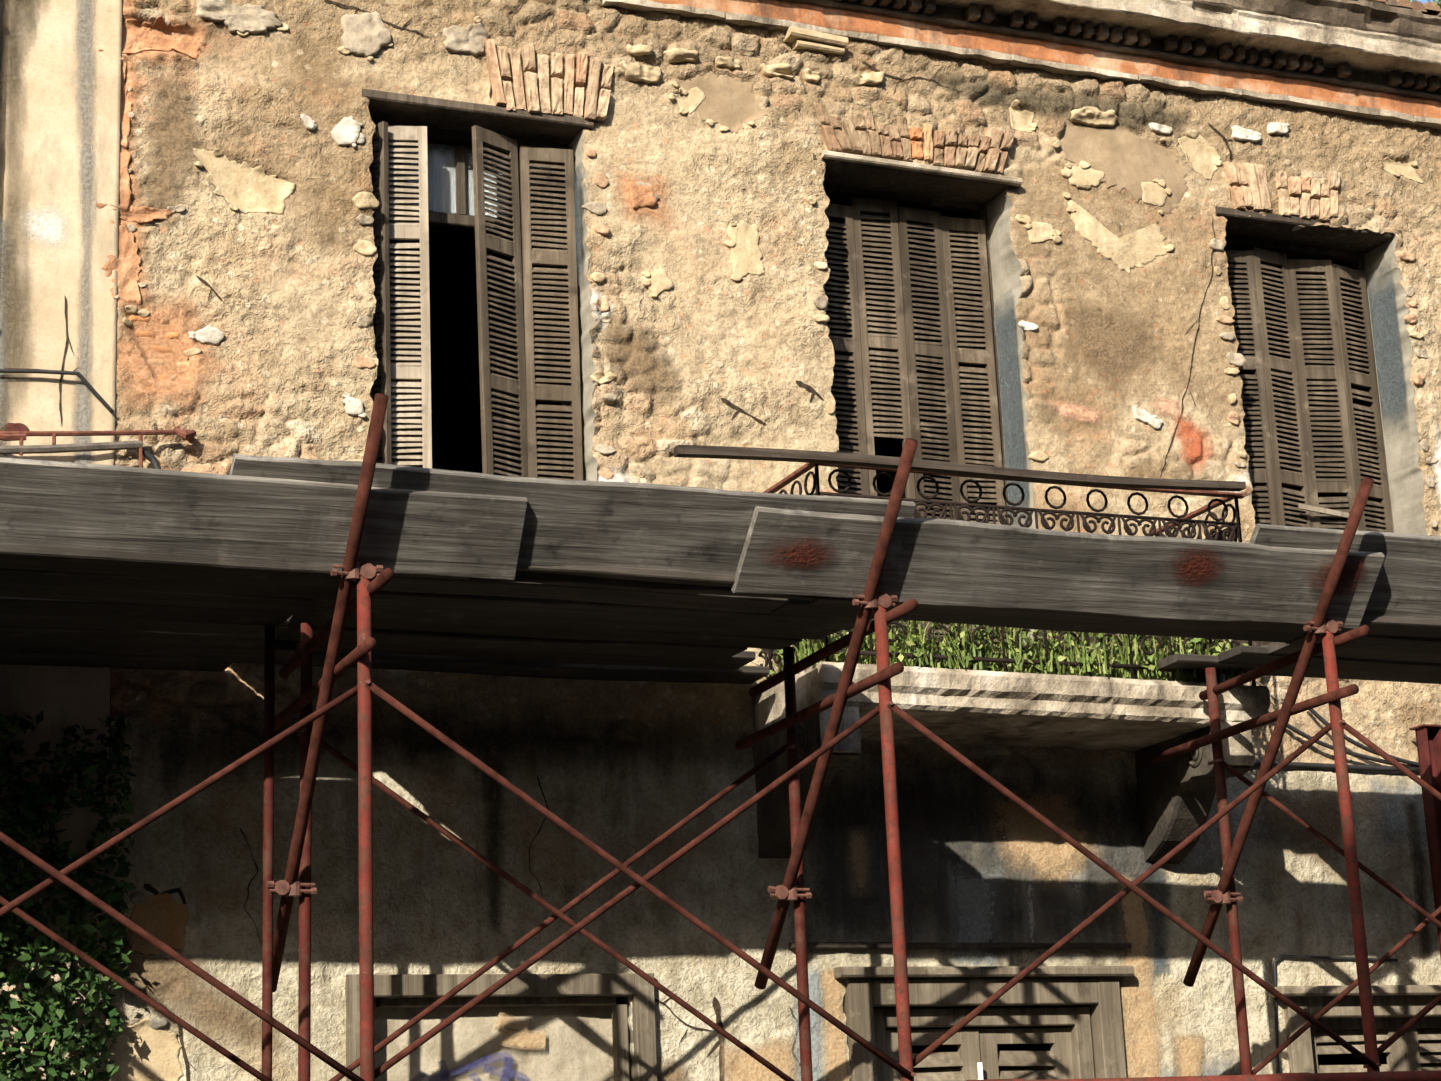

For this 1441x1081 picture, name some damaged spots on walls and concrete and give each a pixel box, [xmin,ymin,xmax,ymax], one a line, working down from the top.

leakage [5,0,33,149]
spalling [337,11,393,62]
spalling [619,48,821,133]
leakage [74,0,94,464]
spalling [95,0,296,404]
spalling [352,192,380,256]
spalling [1015,110,1222,274]
leakage [0,195,64,444]
peeling [994,297,1049,521]
peeling [1368,279,1428,421]
crack [239,827,262,944]
leakage [805,768,1169,974]